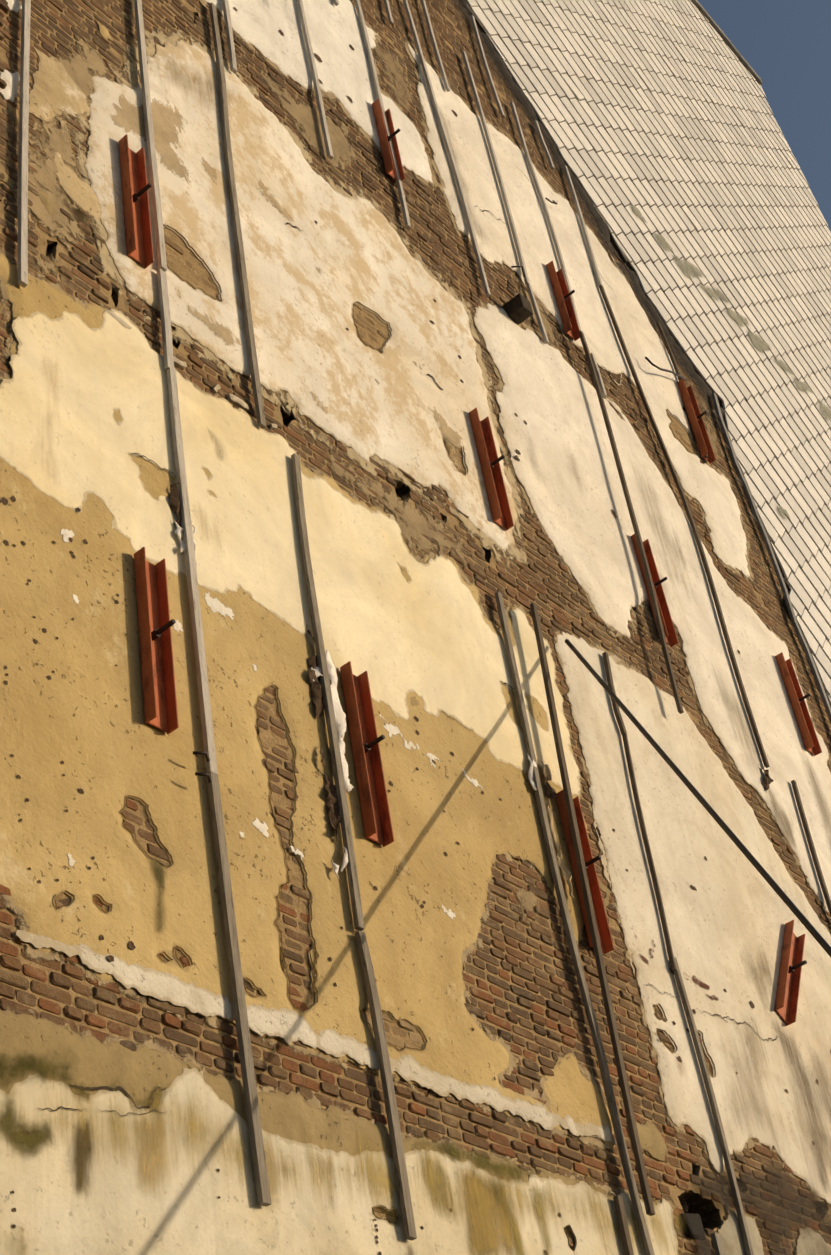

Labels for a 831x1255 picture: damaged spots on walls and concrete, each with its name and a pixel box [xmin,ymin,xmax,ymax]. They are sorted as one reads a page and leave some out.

flaking render [0,2,753,712]
peeling [0,454,831,1255]
crack [646,983,779,1042]
leakage [0,1103,52,1154]
leakage [75,1116,91,1191]
leakage [358,1154,394,1198]
leakage [424,1157,554,1255]
leakage [590,1200,639,1239]